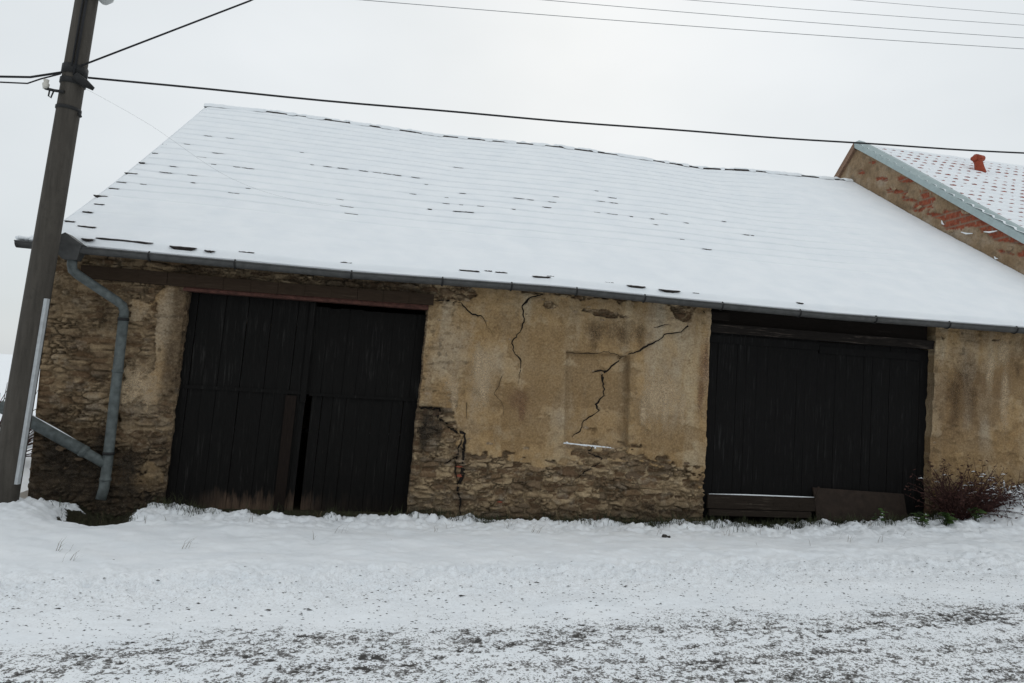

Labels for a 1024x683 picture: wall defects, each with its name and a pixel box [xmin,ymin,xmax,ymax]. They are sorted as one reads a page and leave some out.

spalling [28,254,200,517]
crack [419,403,472,516]
spalling [420,284,478,302]
crack [434,294,543,415]
spalling [406,310,705,523]
crack [568,324,689,479]